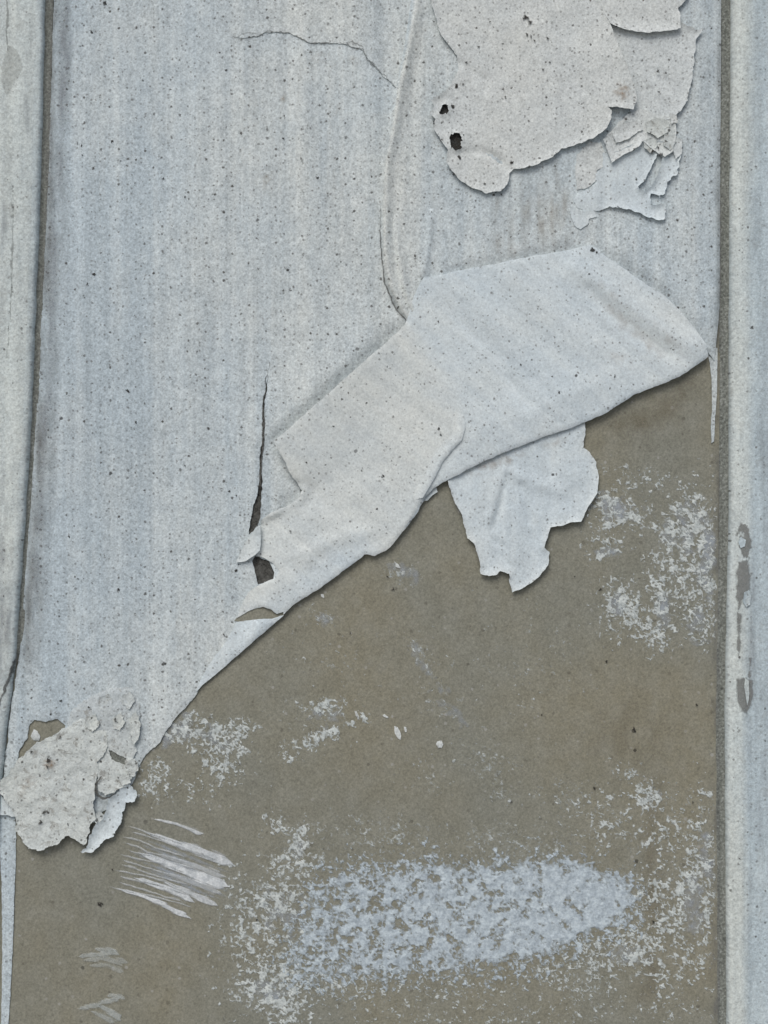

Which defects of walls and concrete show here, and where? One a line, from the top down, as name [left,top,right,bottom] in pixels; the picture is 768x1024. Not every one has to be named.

peeling [430,0,702,230]
peeling [5,178,32,499]
crack [249,362,270,534]
peeling [0,245,720,1024]
spalling [736,524,753,712]